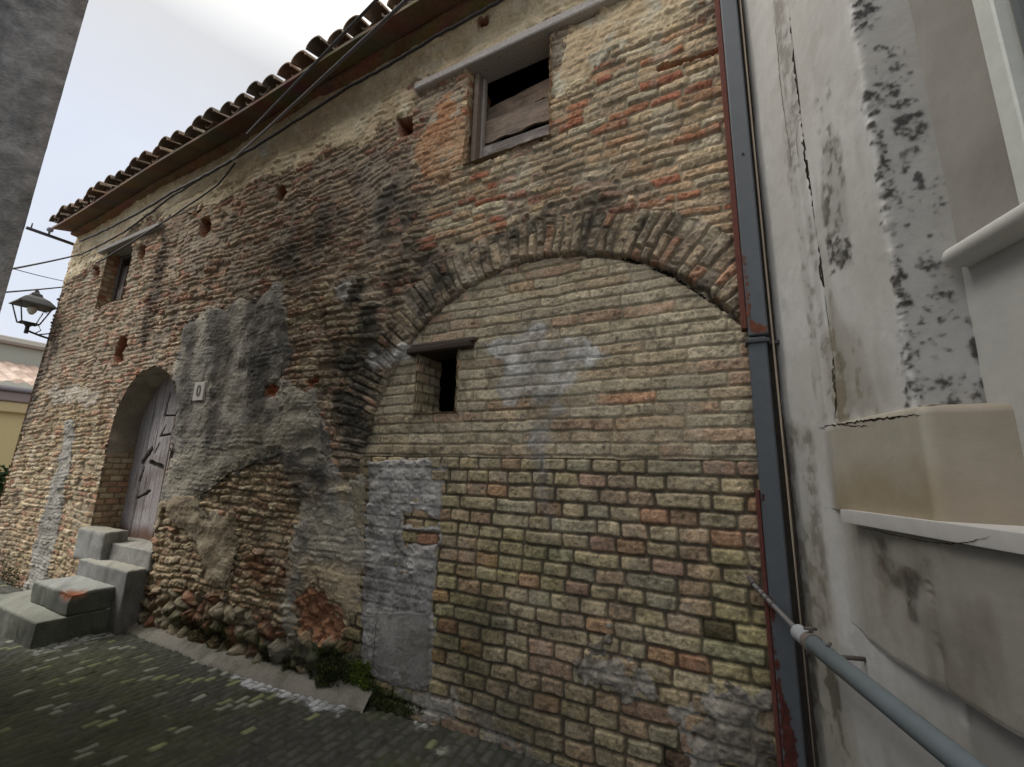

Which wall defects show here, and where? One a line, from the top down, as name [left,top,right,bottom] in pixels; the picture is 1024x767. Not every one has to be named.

damp [852,0,878,31]
crack [773,19,830,328]
damp [863,83,927,225]
damp [890,258,912,312]
damp [316,277,412,446]
damp [487,322,601,406]
crack [820,357,920,429]
damp [901,291,952,368]
damp [905,378,959,407]
damp [970,337,978,357]
peeling [153,281,367,686]
rust [770,598,799,767]